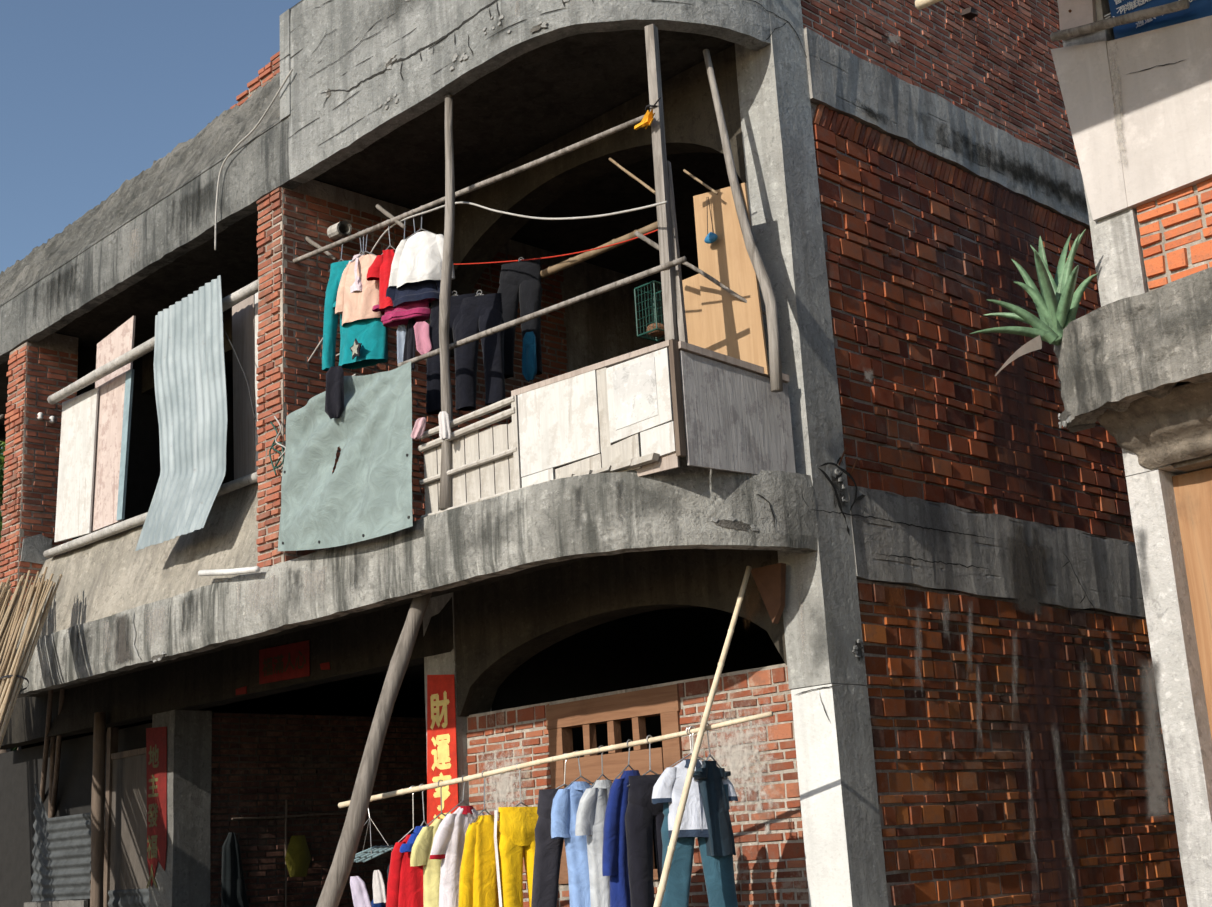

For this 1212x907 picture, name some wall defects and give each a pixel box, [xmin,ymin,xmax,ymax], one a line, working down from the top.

crack [307,0,502,103]
crack [749,0,807,58]
water stain [864,106,888,123]
water stain [925,116,1088,506]
water stain [1009,525,1048,615]
water stain [1013,629,1084,907]